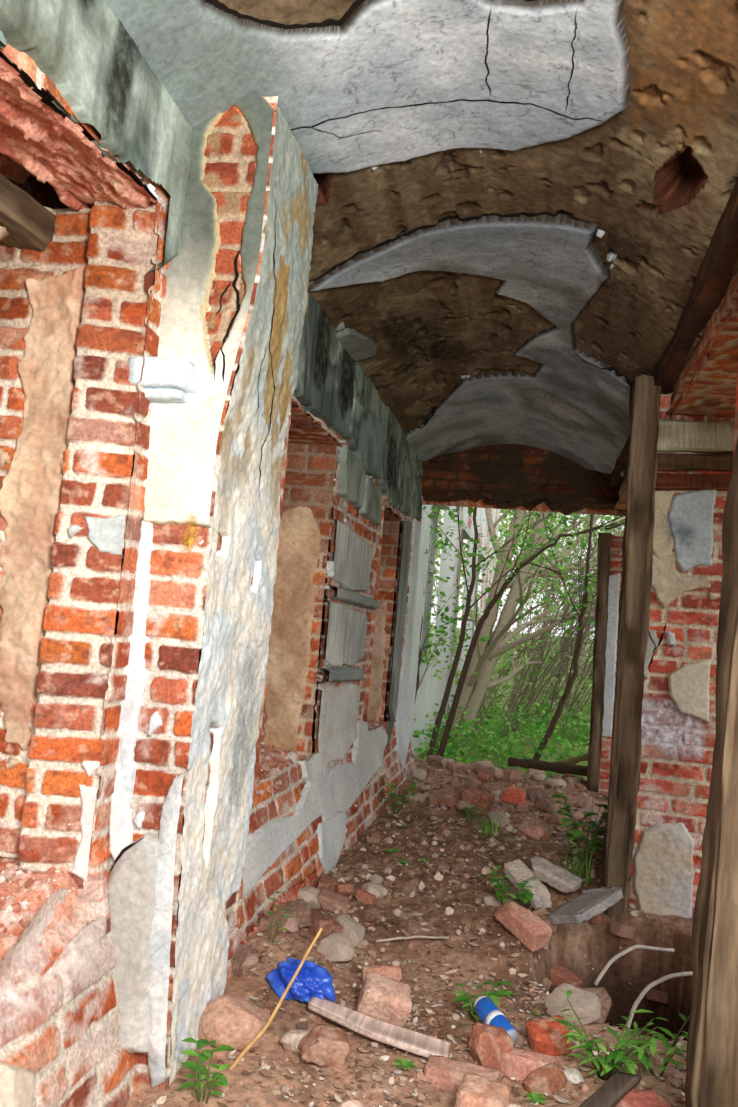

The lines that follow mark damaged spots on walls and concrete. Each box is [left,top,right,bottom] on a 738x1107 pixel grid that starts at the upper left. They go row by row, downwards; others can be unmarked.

crack [205,0,365,30]
water stain [107,23,138,126]
crack [291,11,627,138]
spalling [653,145,710,214]
crack [309,211,598,282]
crack [214,240,243,382]
crack [257,199,277,503]
flaking render [0,0,632,861]
flaking render [653,489,716,573]
flaking render [644,630,676,679]
flaking render [667,659,716,722]
flaking render [68,761,105,883]